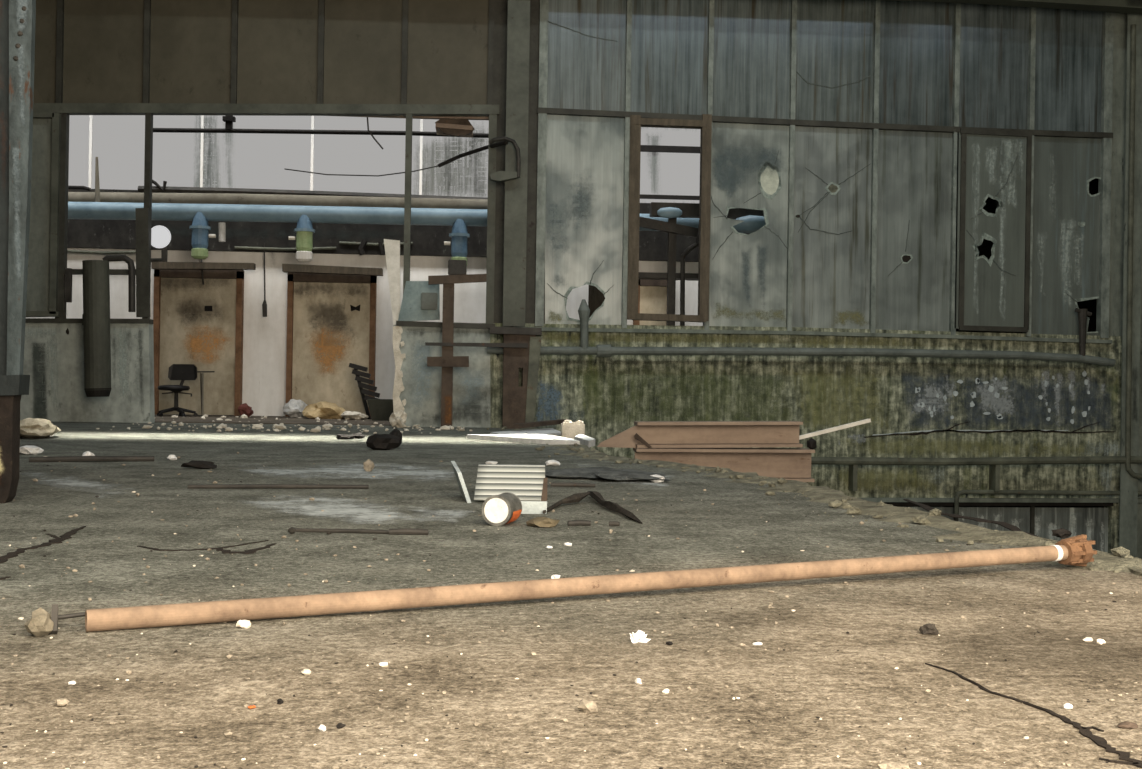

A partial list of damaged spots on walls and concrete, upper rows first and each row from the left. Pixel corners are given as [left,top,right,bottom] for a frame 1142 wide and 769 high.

damp [905,363,1110,427]
damp [45,479,100,487]
damp [254,465,448,478]
damp [257,498,463,521]
crack [0,526,86,580]
crack [925,663,1142,768]